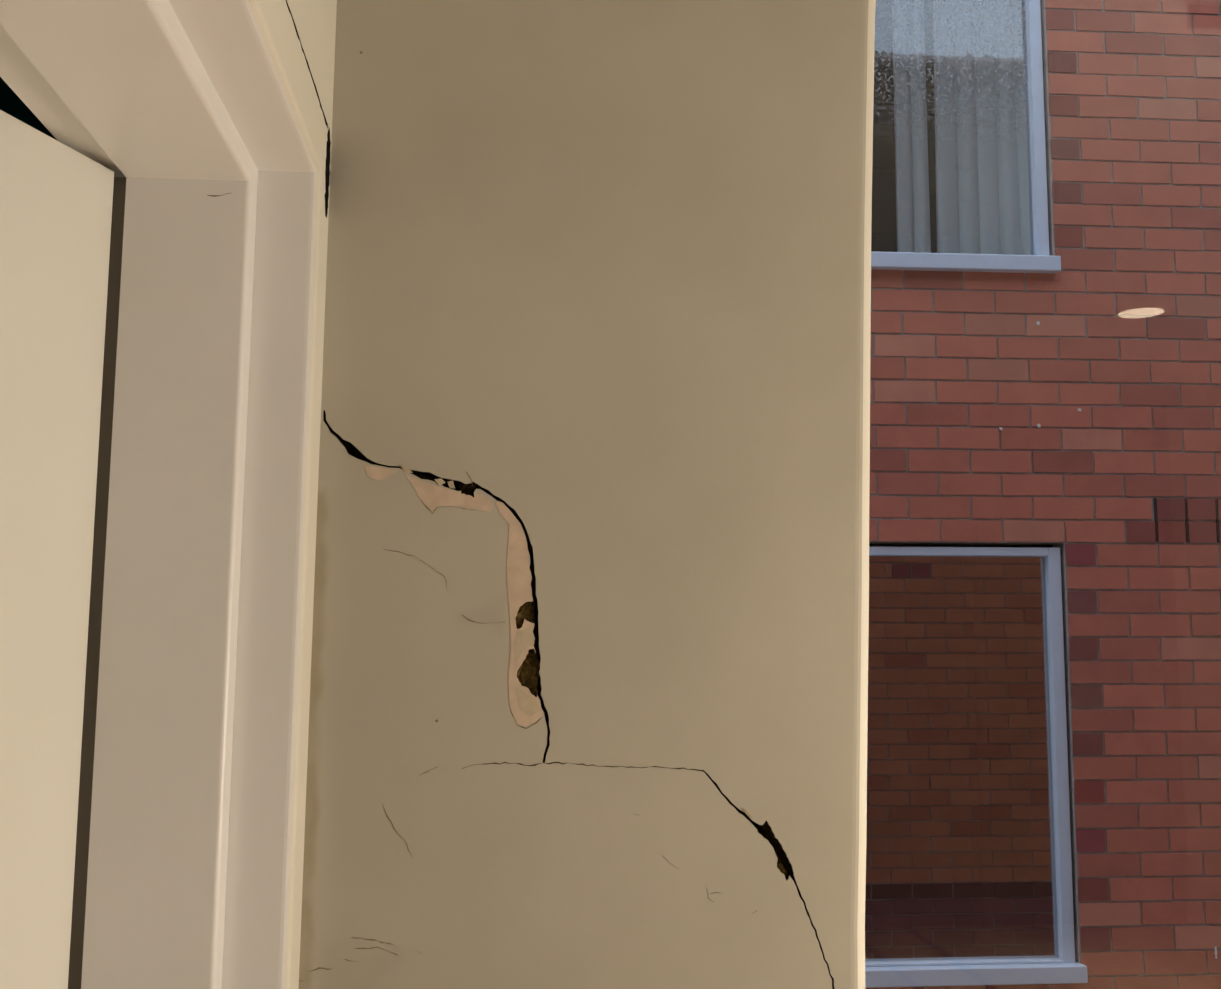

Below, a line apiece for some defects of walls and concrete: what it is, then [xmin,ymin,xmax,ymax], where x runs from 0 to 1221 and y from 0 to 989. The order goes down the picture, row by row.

crack [286,0,331,218]
crack [323,411,834,989]
crack [299,937,422,981]